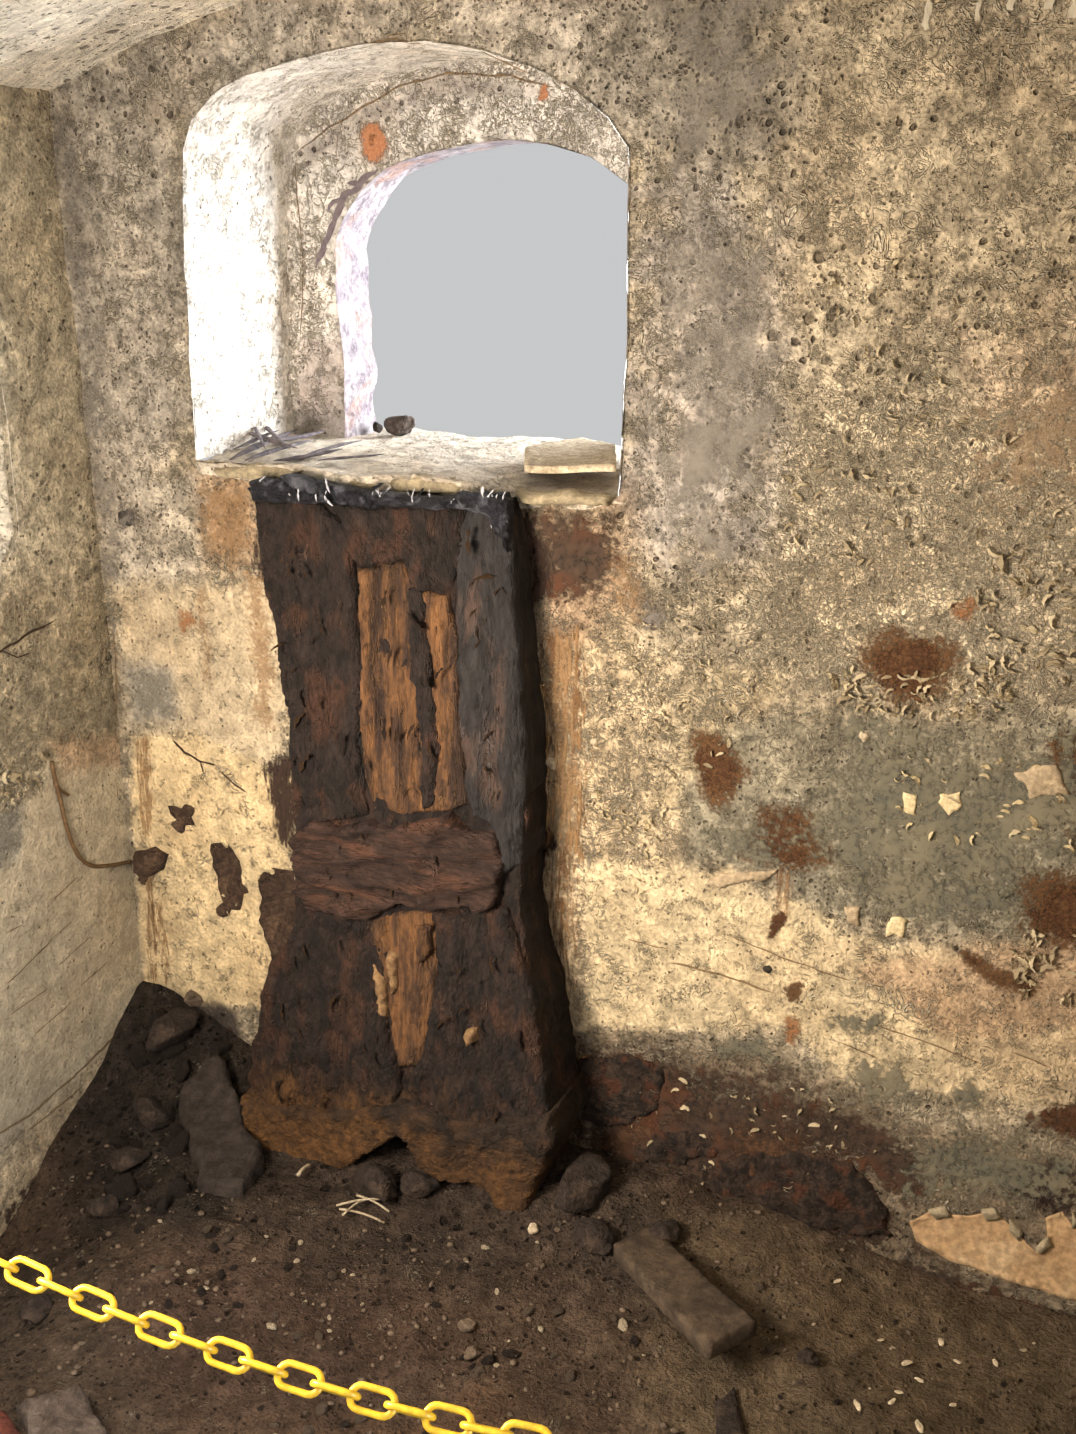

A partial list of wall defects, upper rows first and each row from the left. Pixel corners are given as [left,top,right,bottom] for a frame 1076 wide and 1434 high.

corrosion [359,123,388,162]
crack [0,620,55,658]
corrosion [855,625,963,708]
corrosion [689,730,749,809]
corrosion [740,805,833,938]
corrosion [1015,869,1076,951]
corrosion [1026,1100,1076,1141]
leakage [568,1049,1076,1315]
spalling [909,1206,1076,1301]